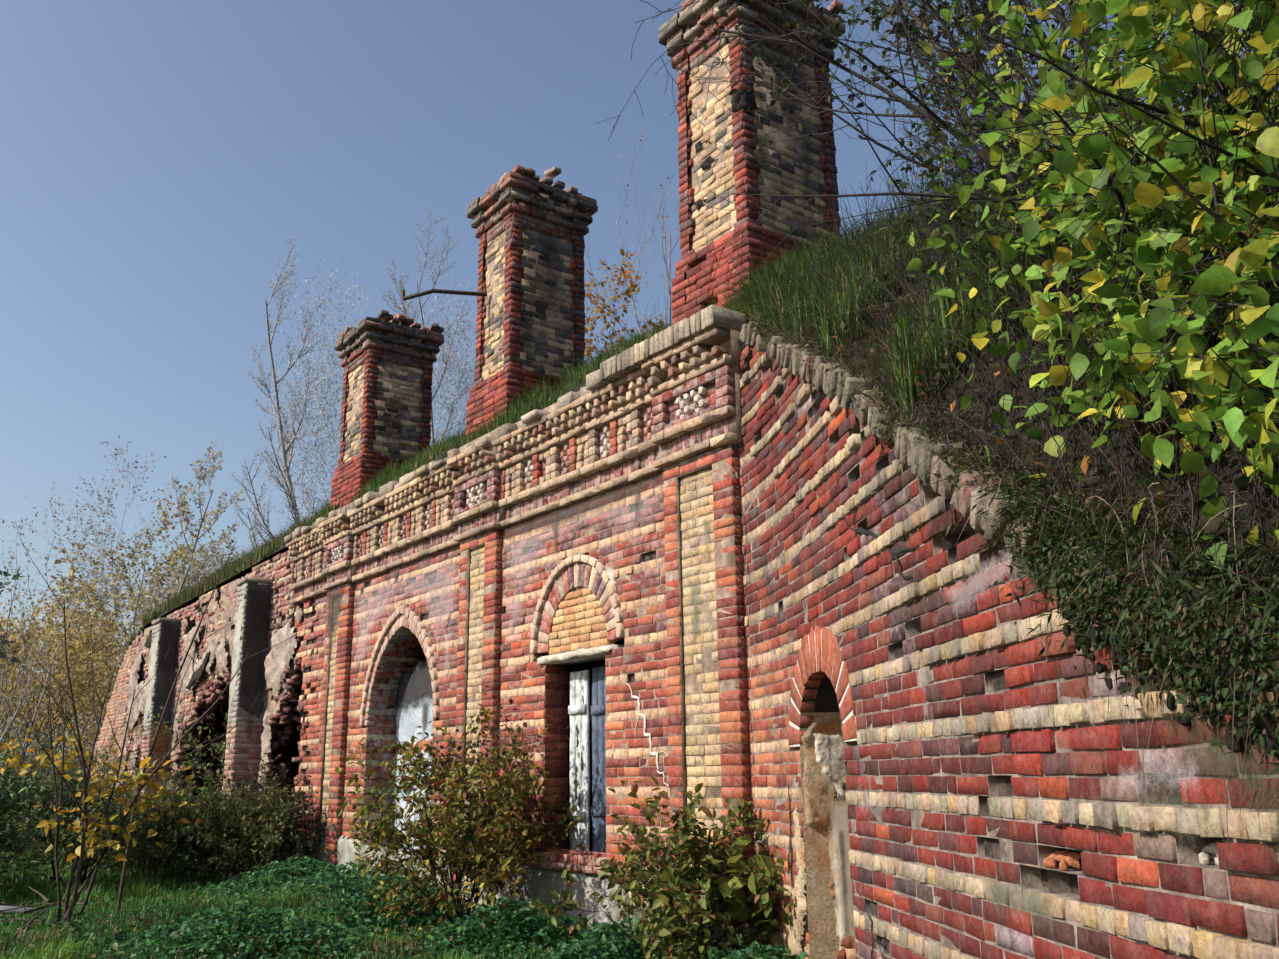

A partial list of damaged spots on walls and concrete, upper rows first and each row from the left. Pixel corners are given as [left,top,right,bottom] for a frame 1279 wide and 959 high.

flaking render [117,633,152,785]
spalling [171,621,232,807]
spalling [256,607,310,817]
crack [625,683,668,786]